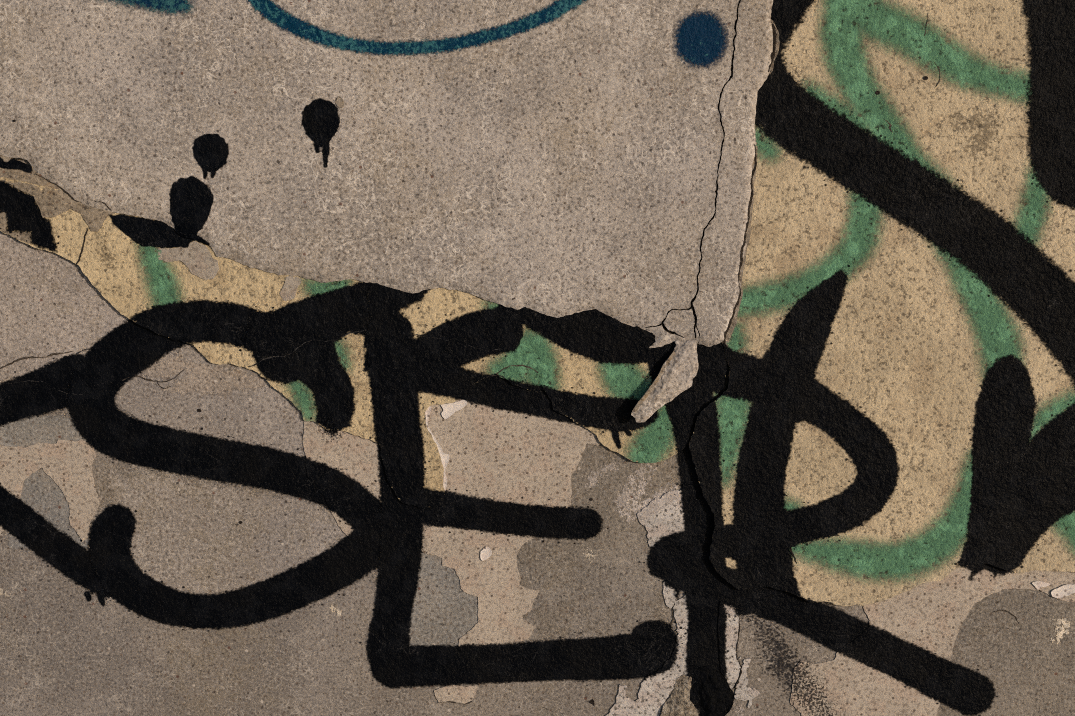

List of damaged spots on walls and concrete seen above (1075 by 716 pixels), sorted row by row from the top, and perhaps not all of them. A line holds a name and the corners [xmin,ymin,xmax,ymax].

peeling [0,212,129,384]
peeling [158,241,219,280]
peeling [115,344,381,500]
peeling [631,340,699,423]
crack [652,0,757,406]
peeling [409,399,760,716]